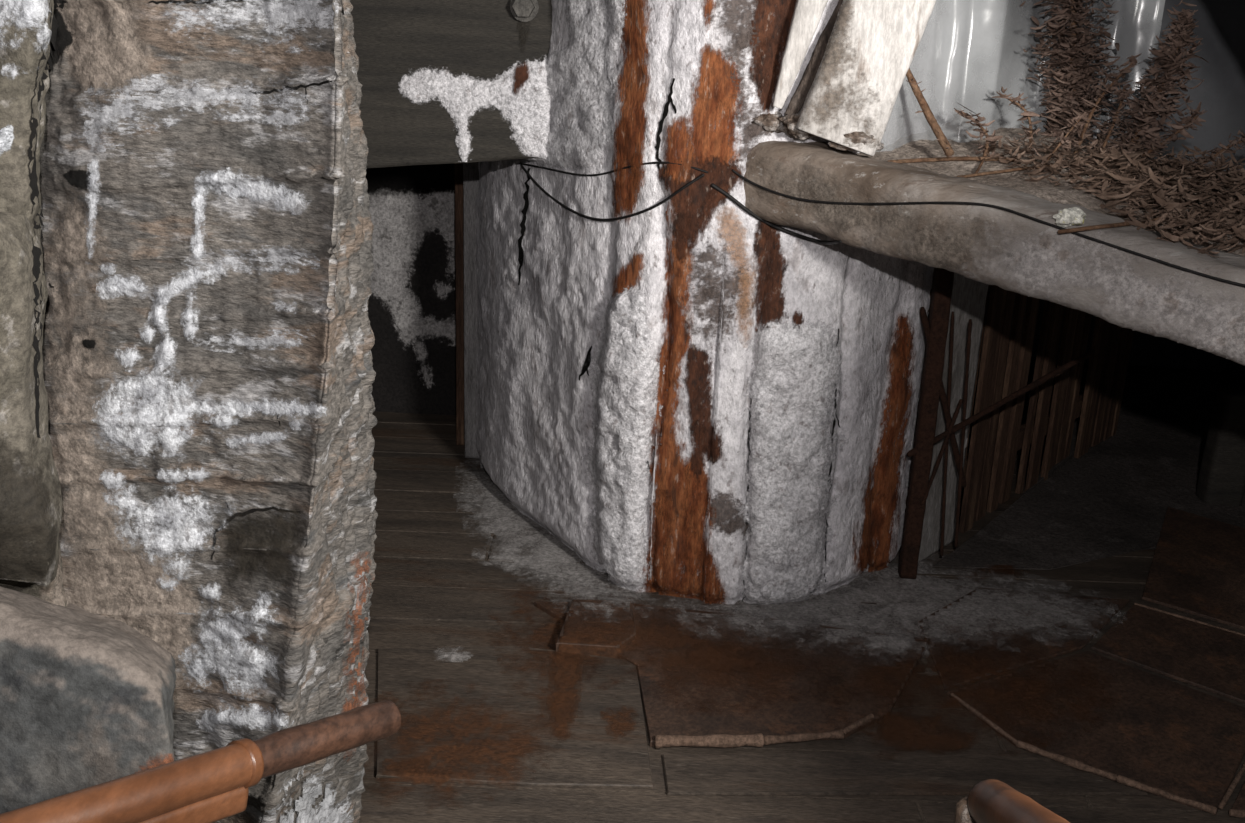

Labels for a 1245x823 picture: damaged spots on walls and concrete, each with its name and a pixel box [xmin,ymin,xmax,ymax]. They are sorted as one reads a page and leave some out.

efflorescence [0,0,52,49]
efflorescence [163,0,341,54]
leakage [399,0,627,172]
crack [655,78,677,169]
efflorescence [81,74,326,590]
leakage [369,188,456,389]
crack [518,168,531,285]
rust [610,0,804,605]
rust [852,314,915,574]
efflorescence [178,584,294,732]